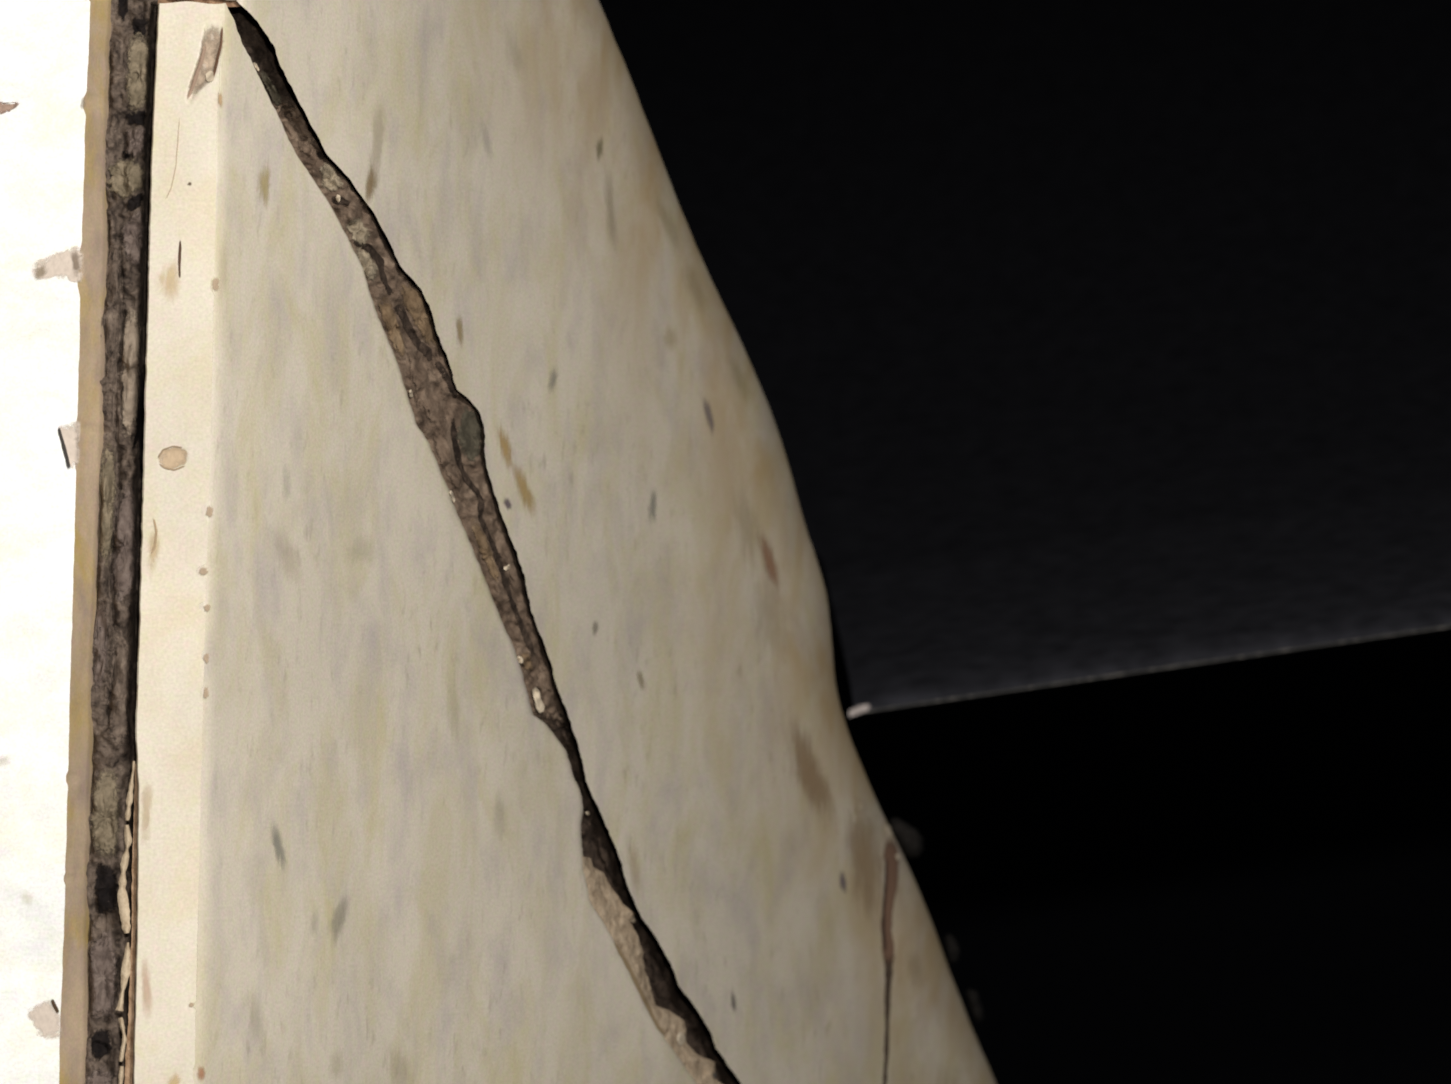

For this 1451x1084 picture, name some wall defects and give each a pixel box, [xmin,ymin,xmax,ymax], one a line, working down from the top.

crack [150,520,158,552]
crack [158,0,741,1084]
crack [881,825,900,1084]